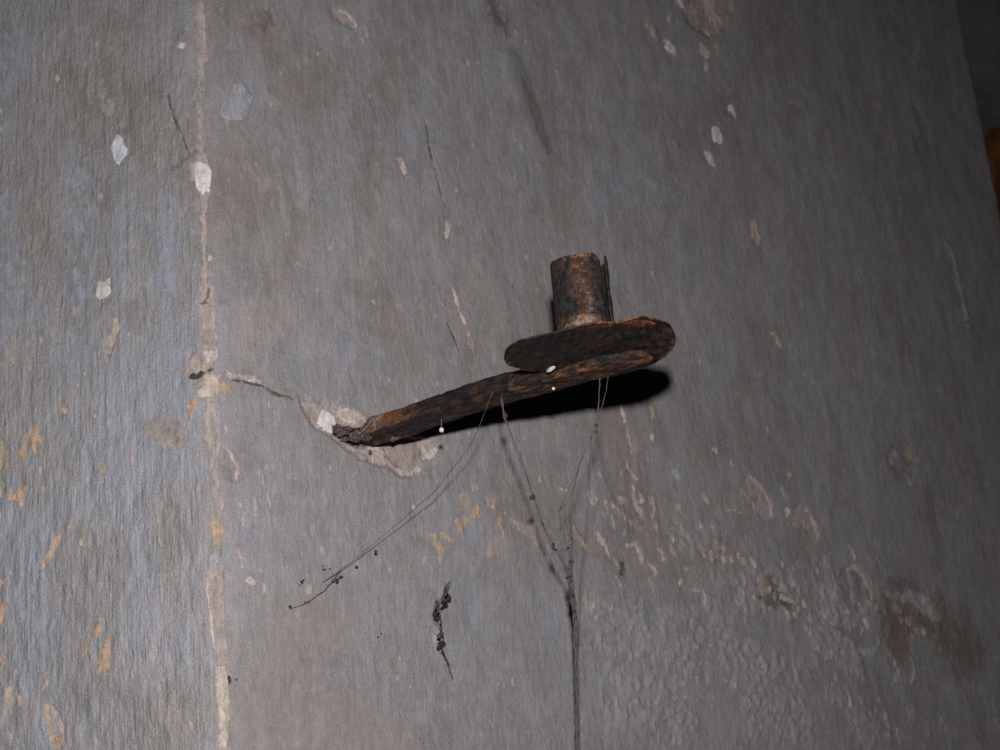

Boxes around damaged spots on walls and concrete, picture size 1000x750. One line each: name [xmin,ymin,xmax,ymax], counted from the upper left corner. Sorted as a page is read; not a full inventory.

flaking render [667,0,733,71]
flaking render [111,134,127,165]
flaking render [177,0,272,750]
flaking render [296,393,439,479]
peeling [0,425,57,521]
peeling [41,525,71,570]
peeling [409,483,541,573]
peeling [573,396,880,682]
peeling [84,617,112,675]
peeling [4,686,21,746]
peeling [45,704,65,749]